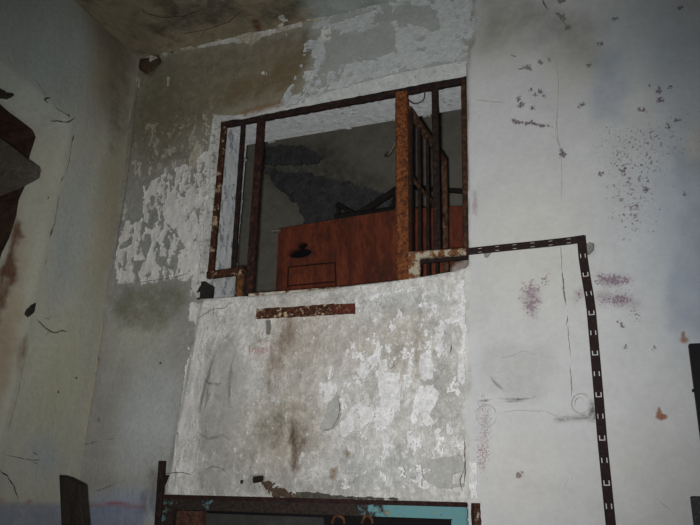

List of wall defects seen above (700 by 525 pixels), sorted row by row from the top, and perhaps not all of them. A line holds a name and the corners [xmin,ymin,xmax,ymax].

peeling [136,0,478,108]
crack [36,81,74,237]
peeling [115,107,282,479]
corrosion [256,303,356,319]
peeling [235,280,478,500]
crack [561,255,572,396]